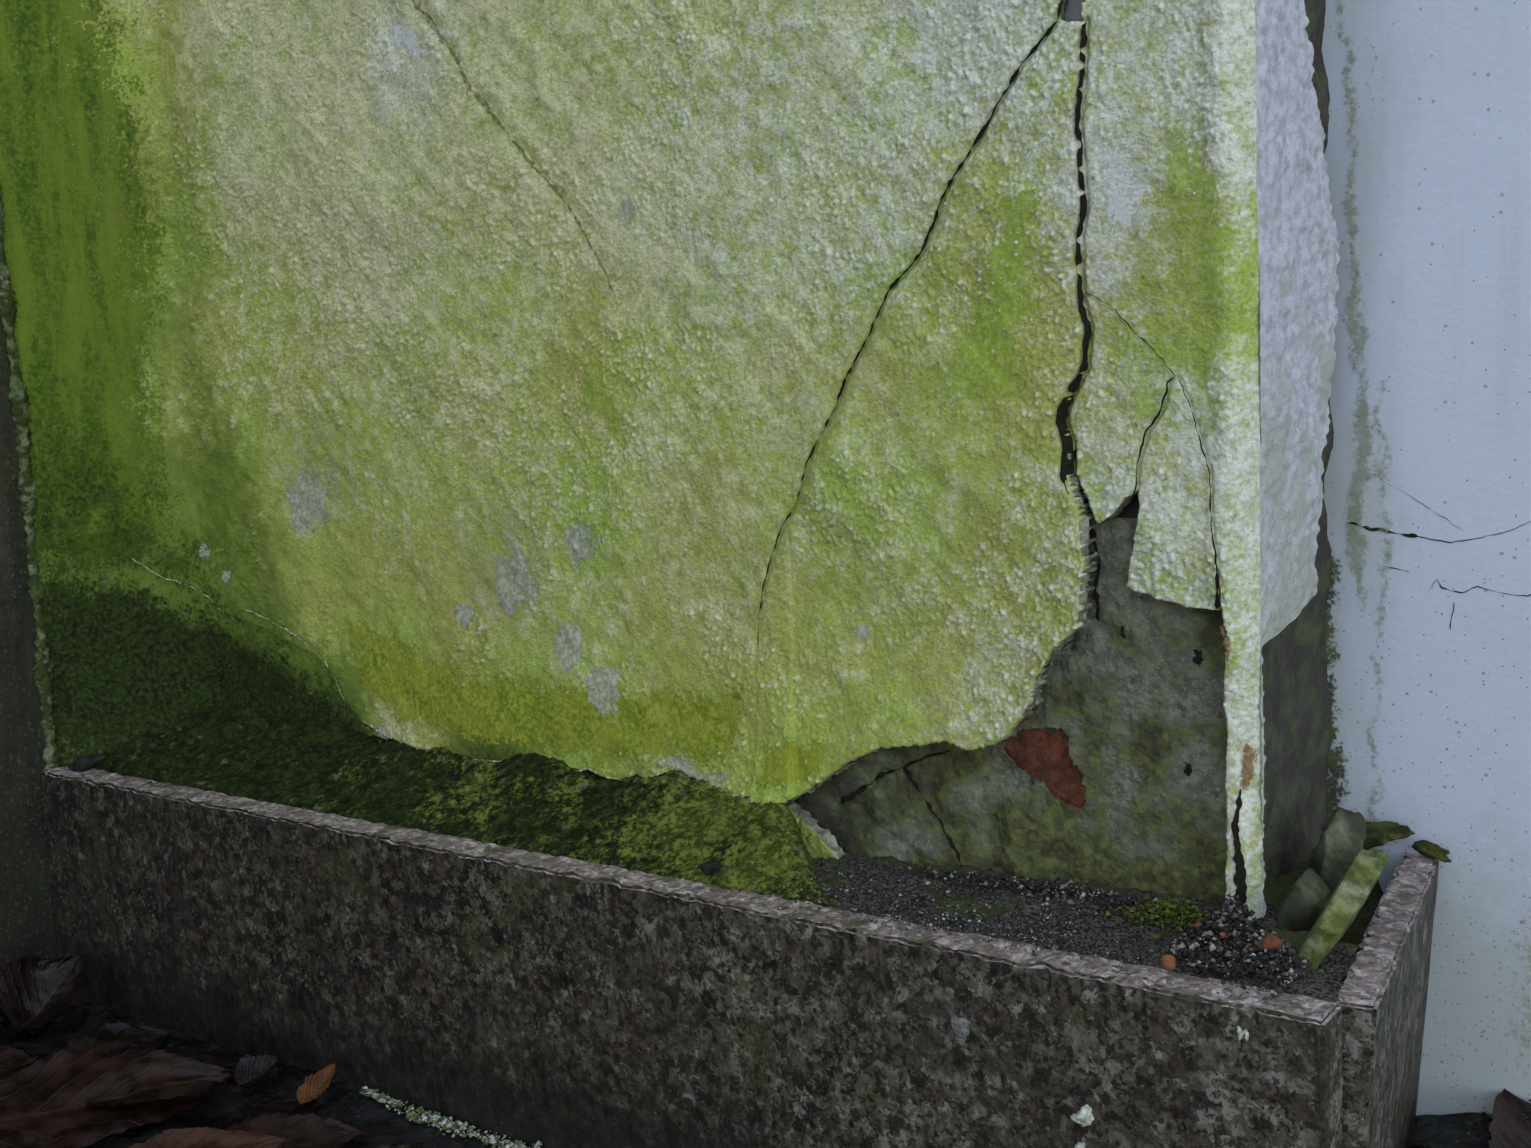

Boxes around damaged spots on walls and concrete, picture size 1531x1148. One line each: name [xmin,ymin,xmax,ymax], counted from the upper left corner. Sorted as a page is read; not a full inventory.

crack [756,0,1222,664]
spalling [794,517,1227,904]
crack [1347,474,1531,630]